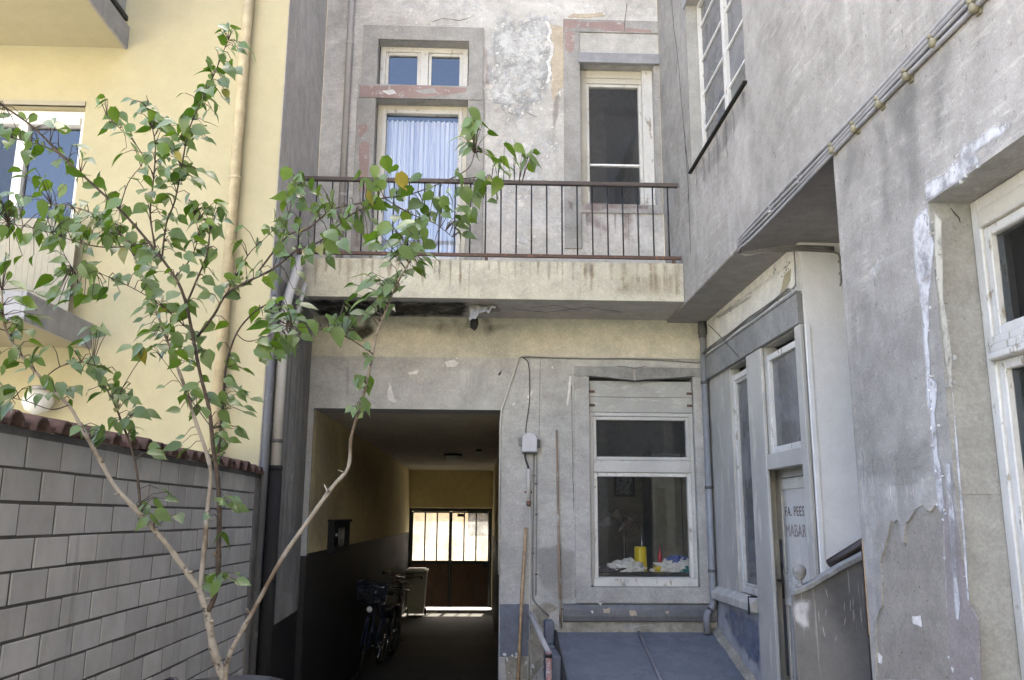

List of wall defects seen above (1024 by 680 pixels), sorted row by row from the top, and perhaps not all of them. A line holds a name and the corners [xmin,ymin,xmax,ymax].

peeling [483,10,652,161]
damp [312,300,466,339]
spalling [878,124,1008,680]